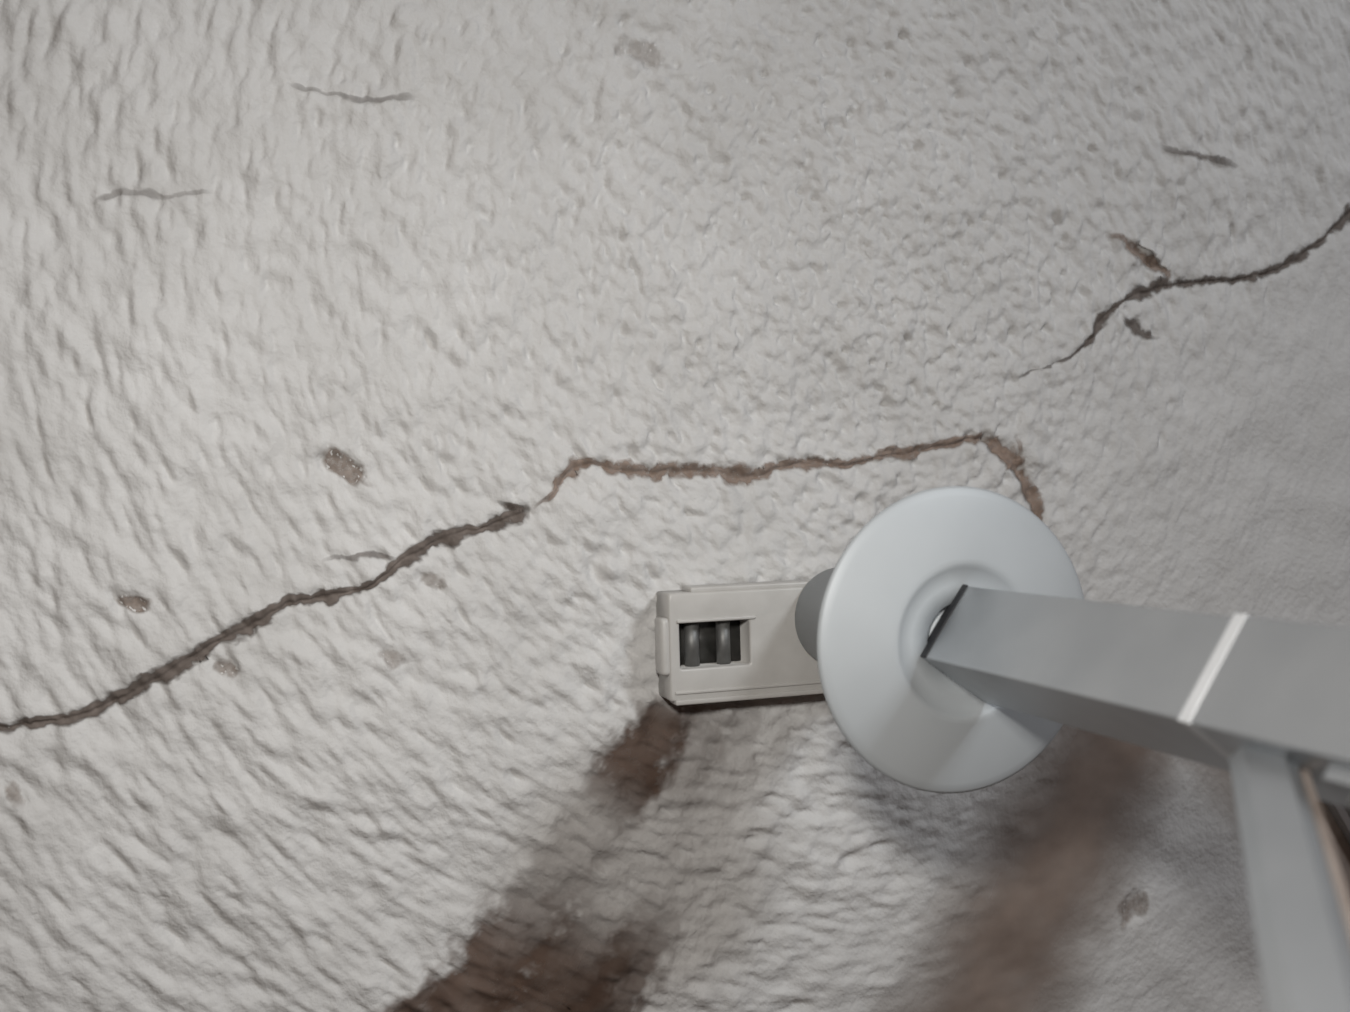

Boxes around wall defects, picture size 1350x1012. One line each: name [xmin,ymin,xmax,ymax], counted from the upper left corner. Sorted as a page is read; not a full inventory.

crack [1050,203,1350,367]
crack [0,432,1044,732]